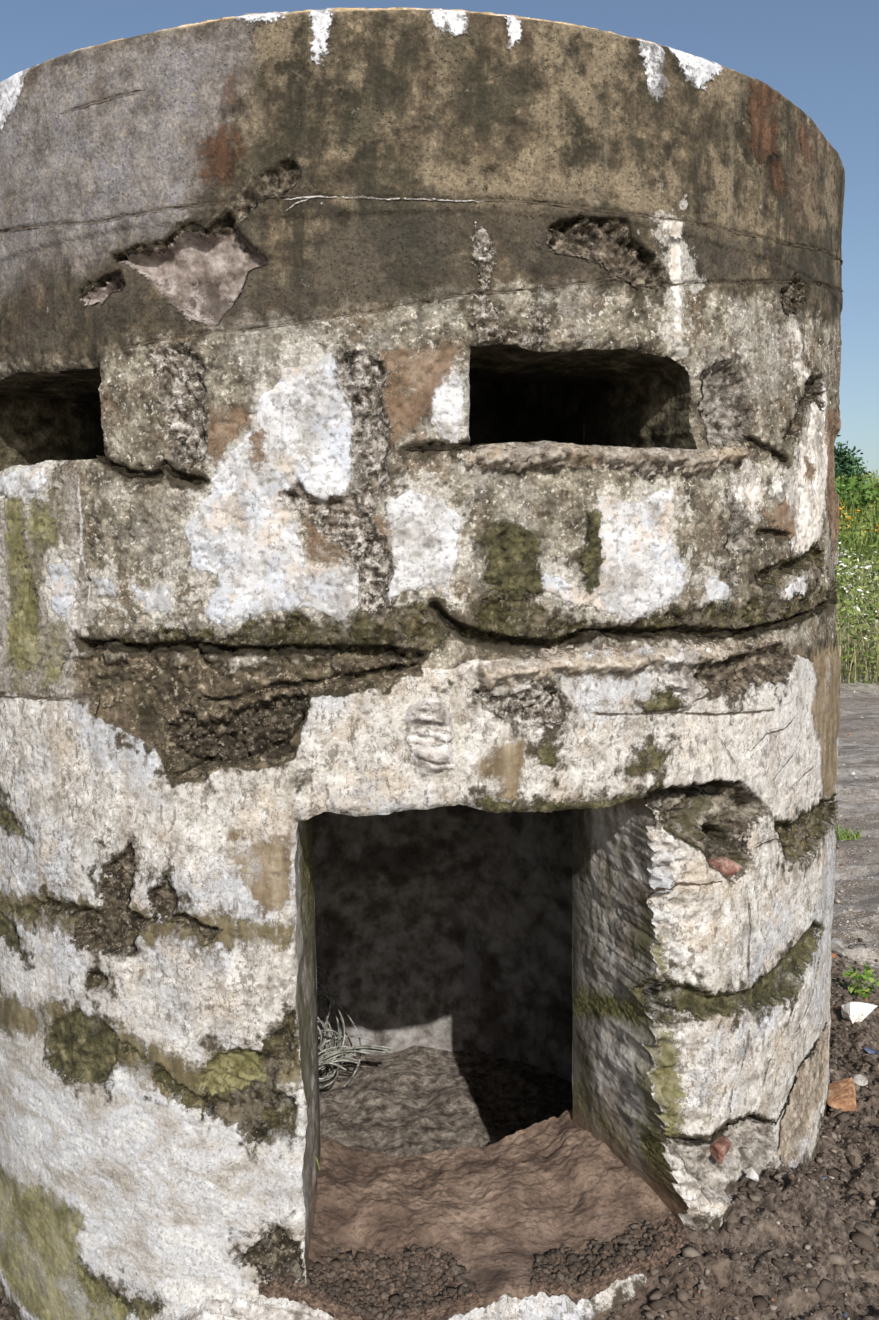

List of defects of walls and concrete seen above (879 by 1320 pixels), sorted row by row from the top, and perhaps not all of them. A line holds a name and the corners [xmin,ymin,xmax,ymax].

spalling [80,152,302,325]
crack [0,195,844,348]
spalling [536,215,667,293]
spalling [780,273,812,315]
peeling [0,465,49,504]
peeling [48,558,116,620]
peeling [73,341,838,782]
spalling [643,780,838,886]
crack [651,956,828,1145]
spalling [662,1025,829,1205]